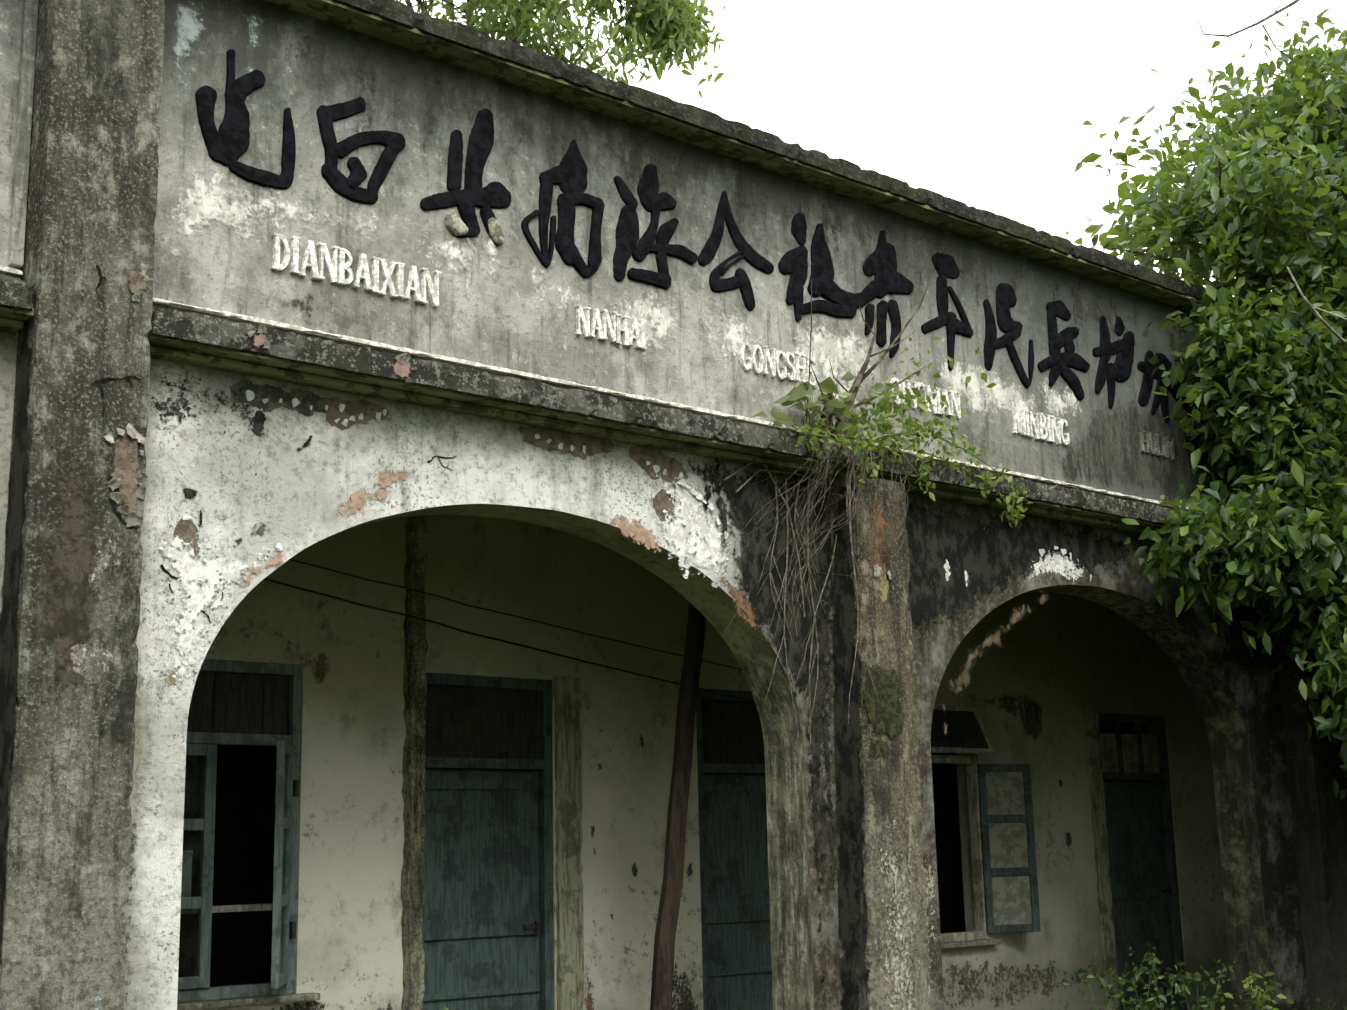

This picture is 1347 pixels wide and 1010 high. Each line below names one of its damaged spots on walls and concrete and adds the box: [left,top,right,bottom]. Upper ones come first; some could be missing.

water stain [0,319,104,959]
spalling [104,423,149,530]
peeling [156,488,297,699]
peeling [230,378,389,431]
peeling [337,466,413,522]
peeling [517,425,731,588]
water stain [905,496,1135,659]
water stain [688,458,1082,1010]
water stain [272,1001,325,1010]
water stain [671,957,700,1010]